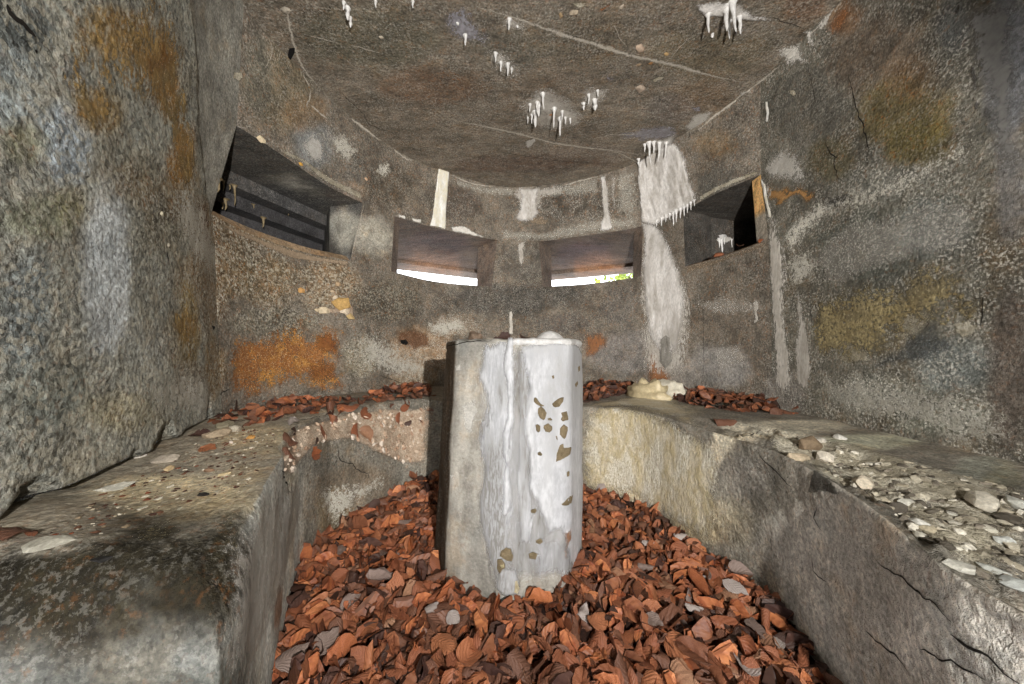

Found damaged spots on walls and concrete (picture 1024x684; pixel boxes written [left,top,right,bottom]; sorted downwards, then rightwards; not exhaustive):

rust [64,0,195,187]
crack [848,77,869,165]
rust [227,319,344,400]
damp [515,187,562,224]
damp [641,224,690,377]
rust [768,187,813,205]
damp [783,139,975,387]
damp [462,311,583,596]
crack [866,559,1019,684]